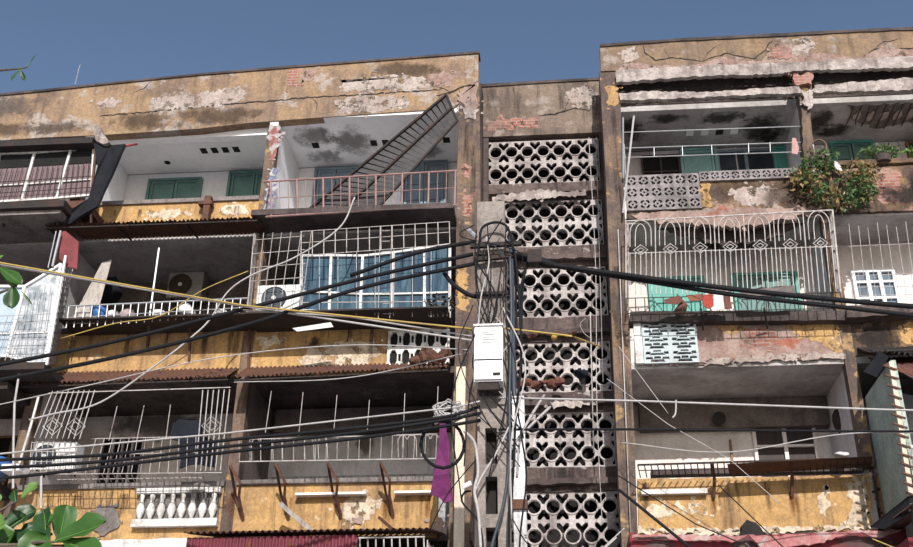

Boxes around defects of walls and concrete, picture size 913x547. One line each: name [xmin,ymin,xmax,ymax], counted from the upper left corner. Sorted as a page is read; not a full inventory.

crack [643,40,773,62]
crack [100,81,478,117]
crack [538,101,588,116]
mould [621,120,643,141]
mould [653,115,686,124]
mould [703,112,782,143]
mould [811,111,848,137]
flaking render [727,180,780,208]
peeling [297,339,387,374]
peeling [329,489,384,529]
spalling [637,495,740,536]
flaking render [760,473,883,535]